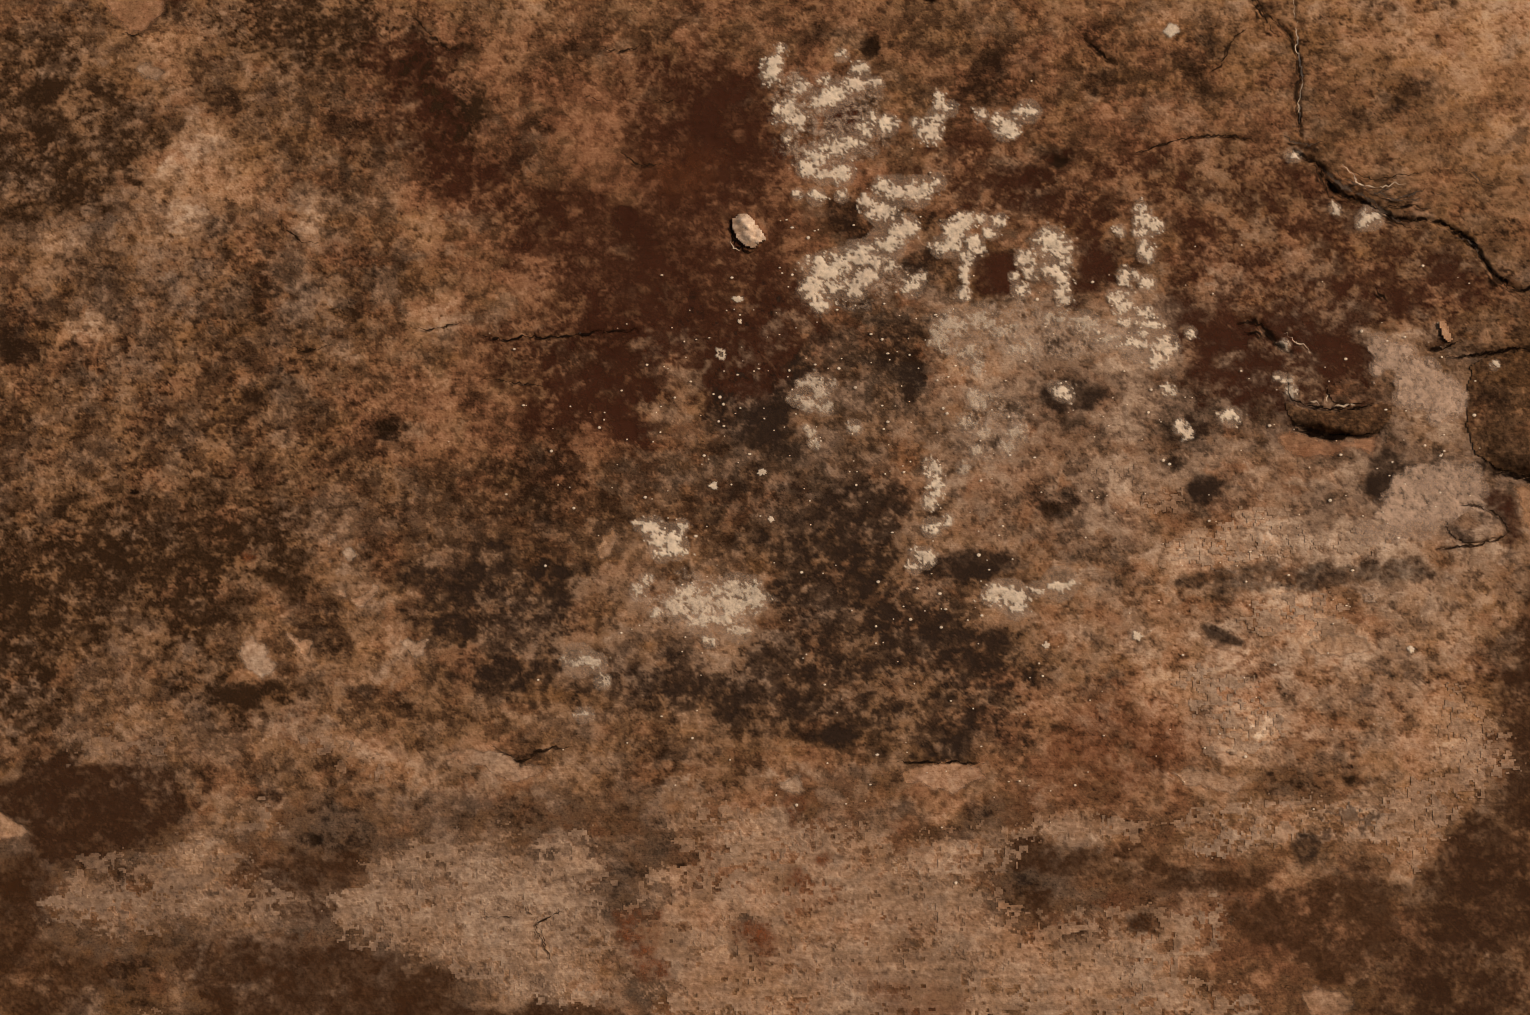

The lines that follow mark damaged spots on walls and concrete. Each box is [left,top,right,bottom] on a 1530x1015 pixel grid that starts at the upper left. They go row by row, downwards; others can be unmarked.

leakage [215,0,1499,456]
crack [1136,0,1530,293]
leakage [398,459,1076,763]
leakage [960,390,1025,471]
leakage [1189,476,1221,504]
leakage [1176,559,1434,599]
leakage [1359,447,1522,544]
leakage [1008,597,1530,1015]